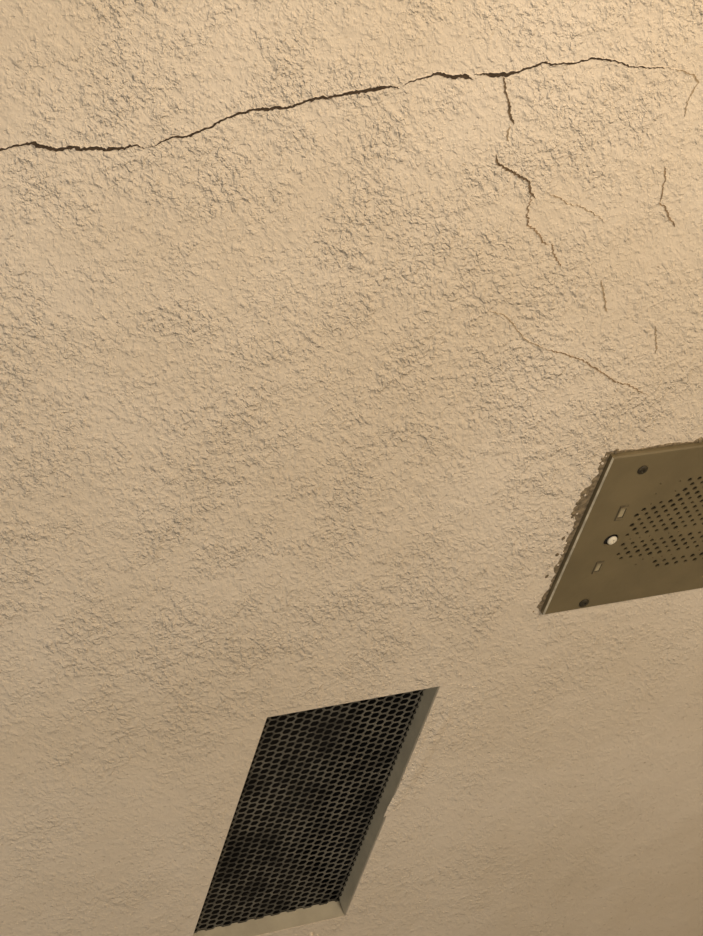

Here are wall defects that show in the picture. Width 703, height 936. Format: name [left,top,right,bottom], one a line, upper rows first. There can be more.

crack [0,56,699,267]